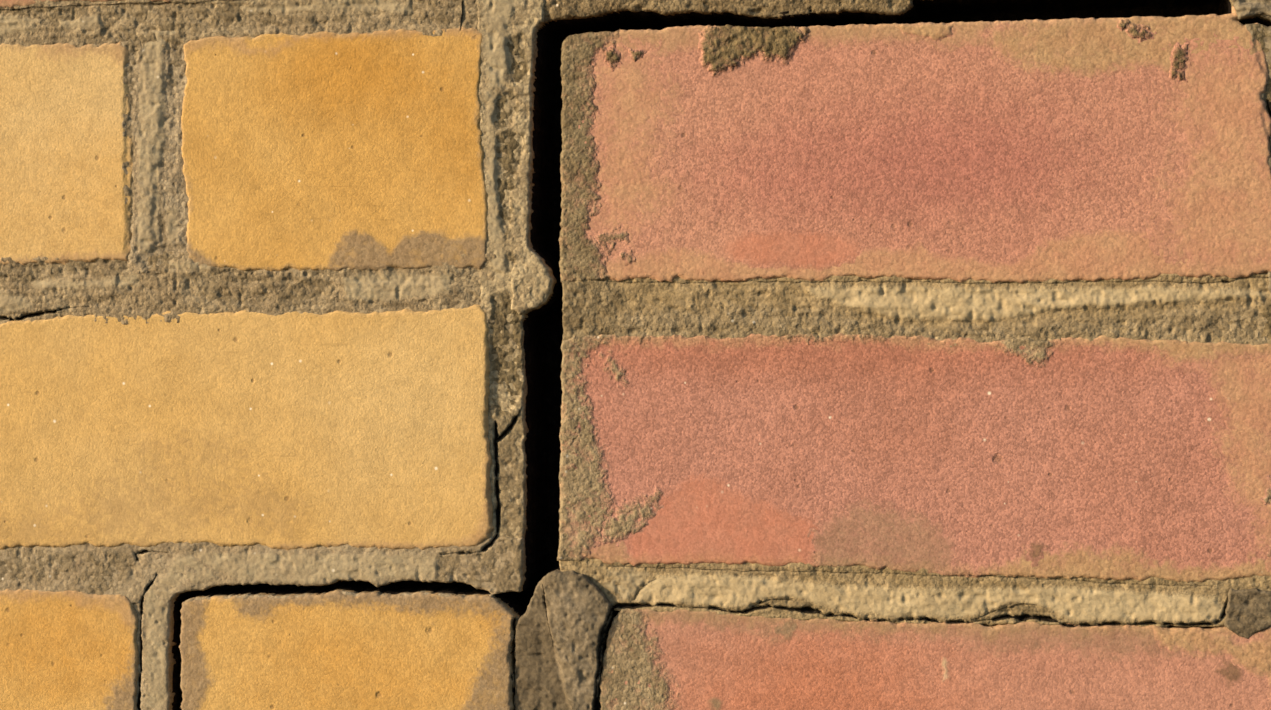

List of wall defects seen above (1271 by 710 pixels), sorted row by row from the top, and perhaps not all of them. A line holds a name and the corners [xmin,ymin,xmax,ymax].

crack [1239,18,1271,27]
spalling [0,0,385,310]
crack [480,0,1232,636]
crack [135,550,167,710]
crack [172,580,491,710]
crack [594,565,1227,710]